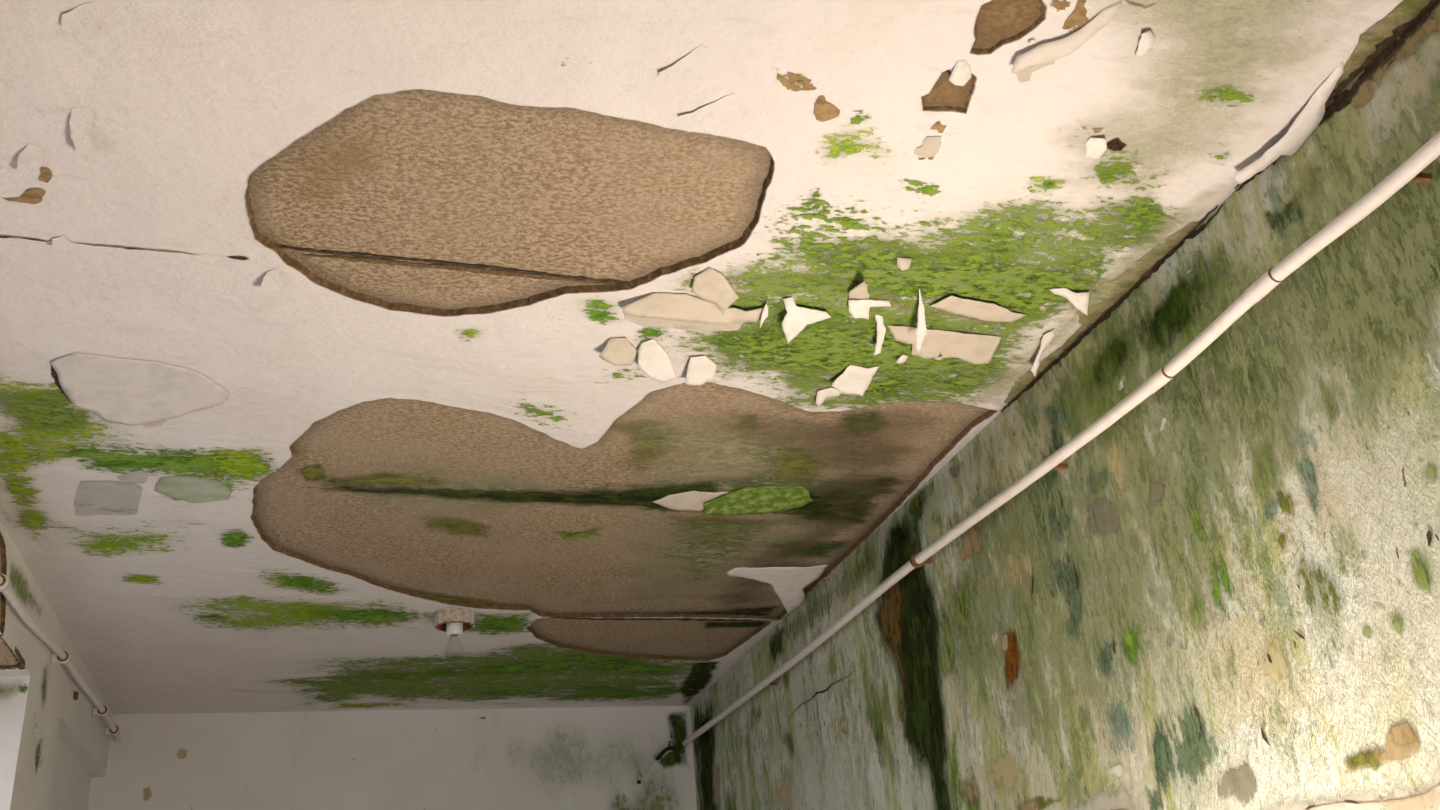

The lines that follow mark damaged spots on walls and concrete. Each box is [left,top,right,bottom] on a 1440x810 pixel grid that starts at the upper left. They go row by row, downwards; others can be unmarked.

flaking render [914,0,1156,160]
crack [0,236,248,260]
flaking render [244,89,1026,661]
peeling [1031,329,1055,377]
peeling [74,470,232,516]
crack [1193,705,1204,738]
crack [1305,783,1440,810]